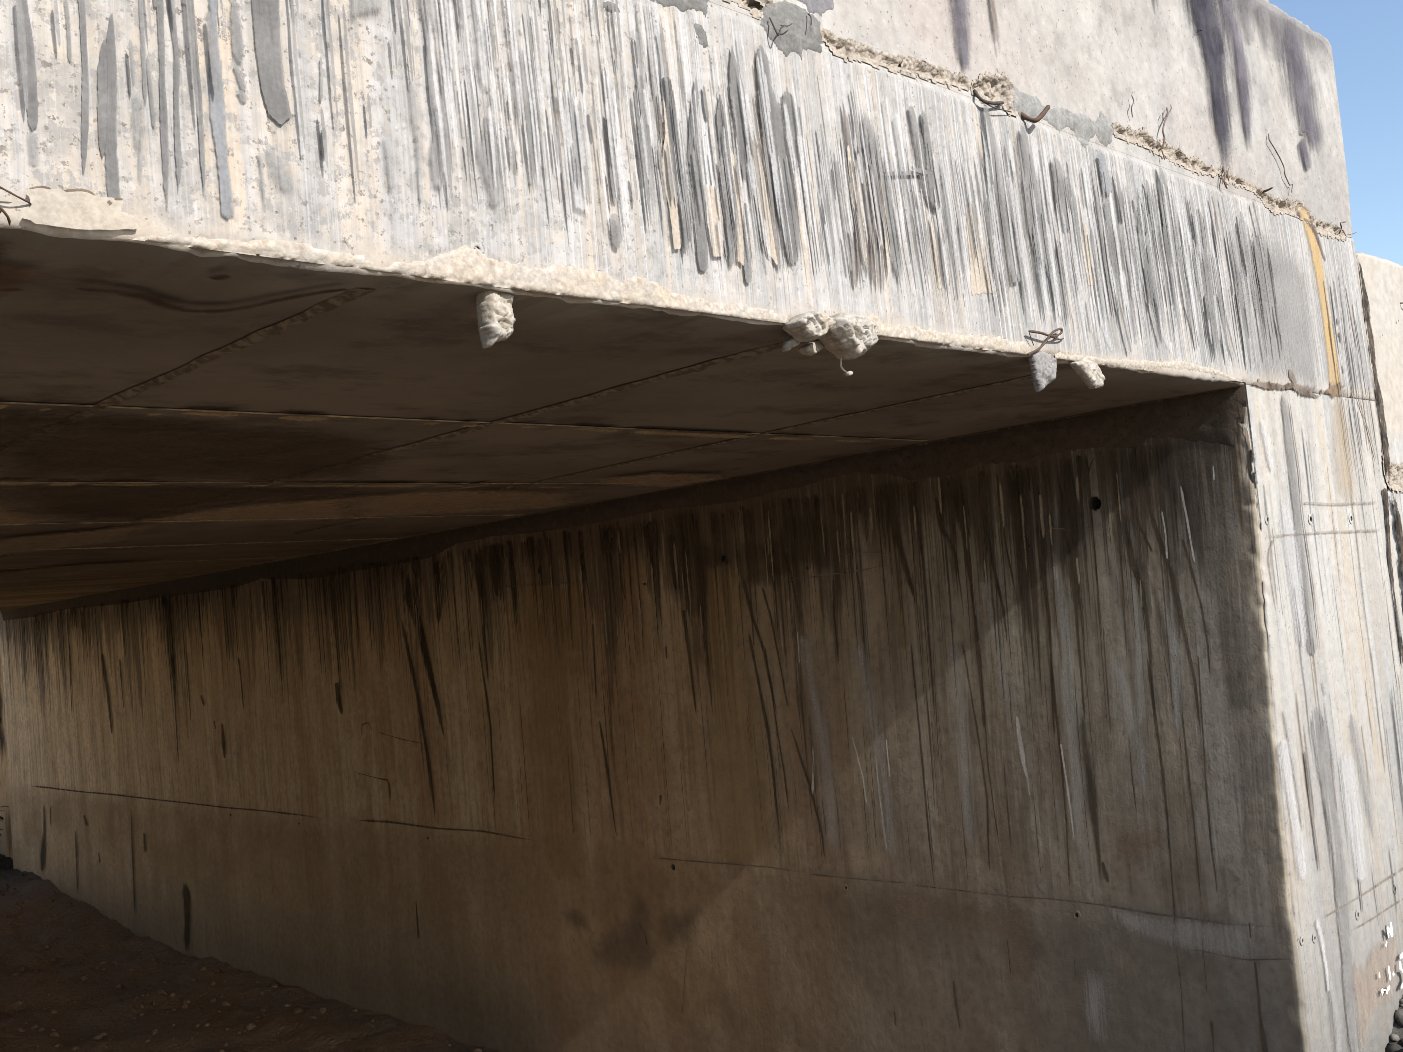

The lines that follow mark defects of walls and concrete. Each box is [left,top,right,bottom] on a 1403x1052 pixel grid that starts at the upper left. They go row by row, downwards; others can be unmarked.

leakage [16,0,38,165]
leakage [54,0,394,218]
spalling [21,188,824,356]
leakage [392,0,1314,379]
leakage [1282,21,1322,169]
crack [1304,218,1326,261]
crack [1252,263,1403,663]
spalling [1383,455,1403,493]
leakage [0,385,1268,1052]
leakage [1261,264,1403,1052]
crack [1330,868,1403,926]